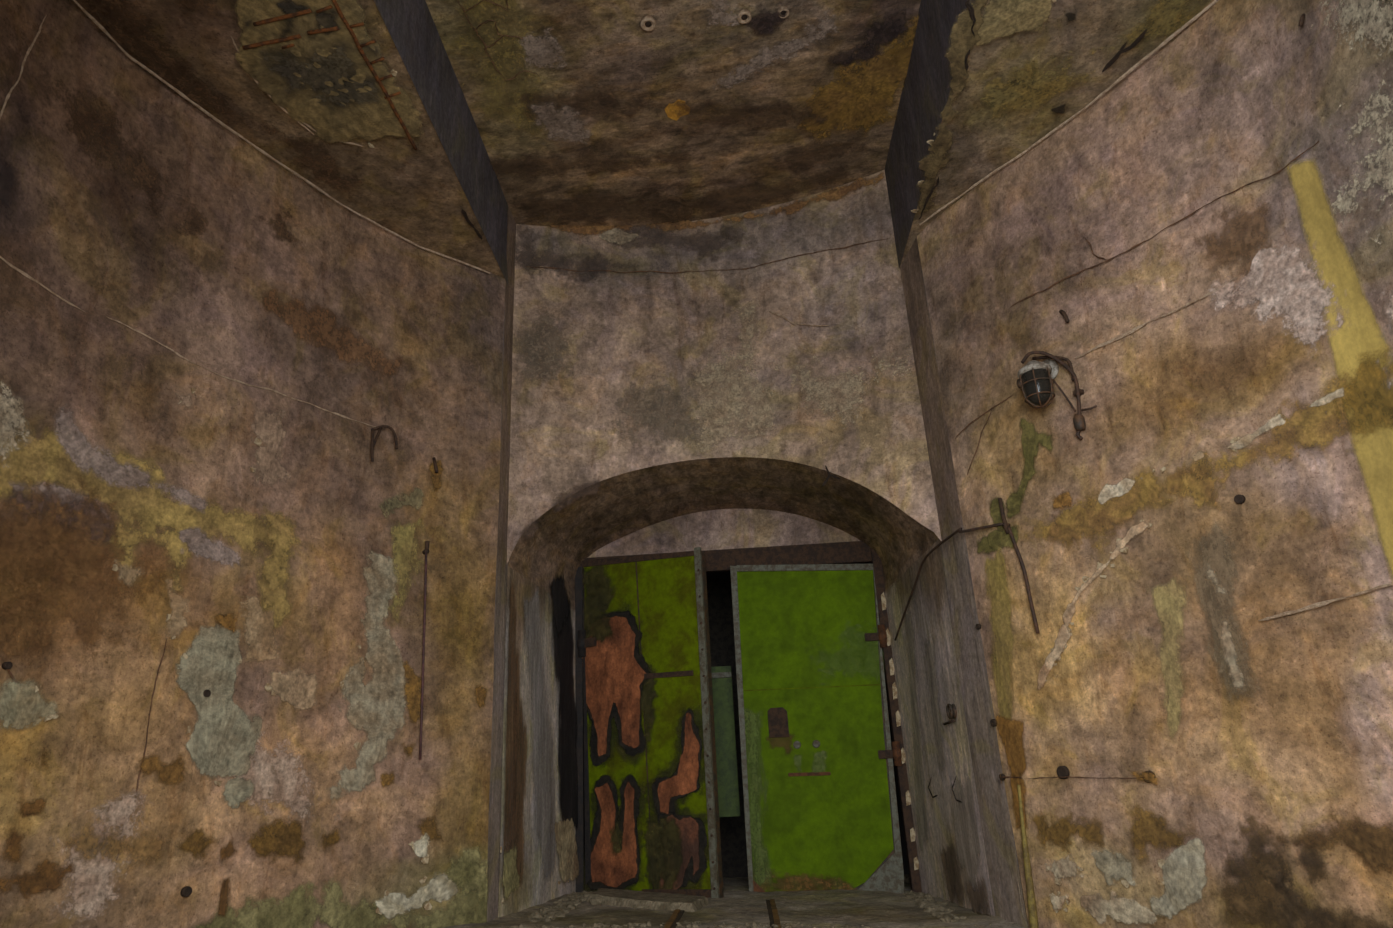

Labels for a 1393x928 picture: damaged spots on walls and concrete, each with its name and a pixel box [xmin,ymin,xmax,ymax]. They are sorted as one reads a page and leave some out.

leakage [453,0,689,177]
leakage [513,0,919,282]
crack [1011,141,1319,307]
leakage [1200,204,1343,345]
efflorescence [1320,0,1393,55]
efflorescence [1331,73,1393,232]
leakage [1025,354,1393,550]
leakage [1193,524,1255,699]
leakage [1216,816,1393,928]